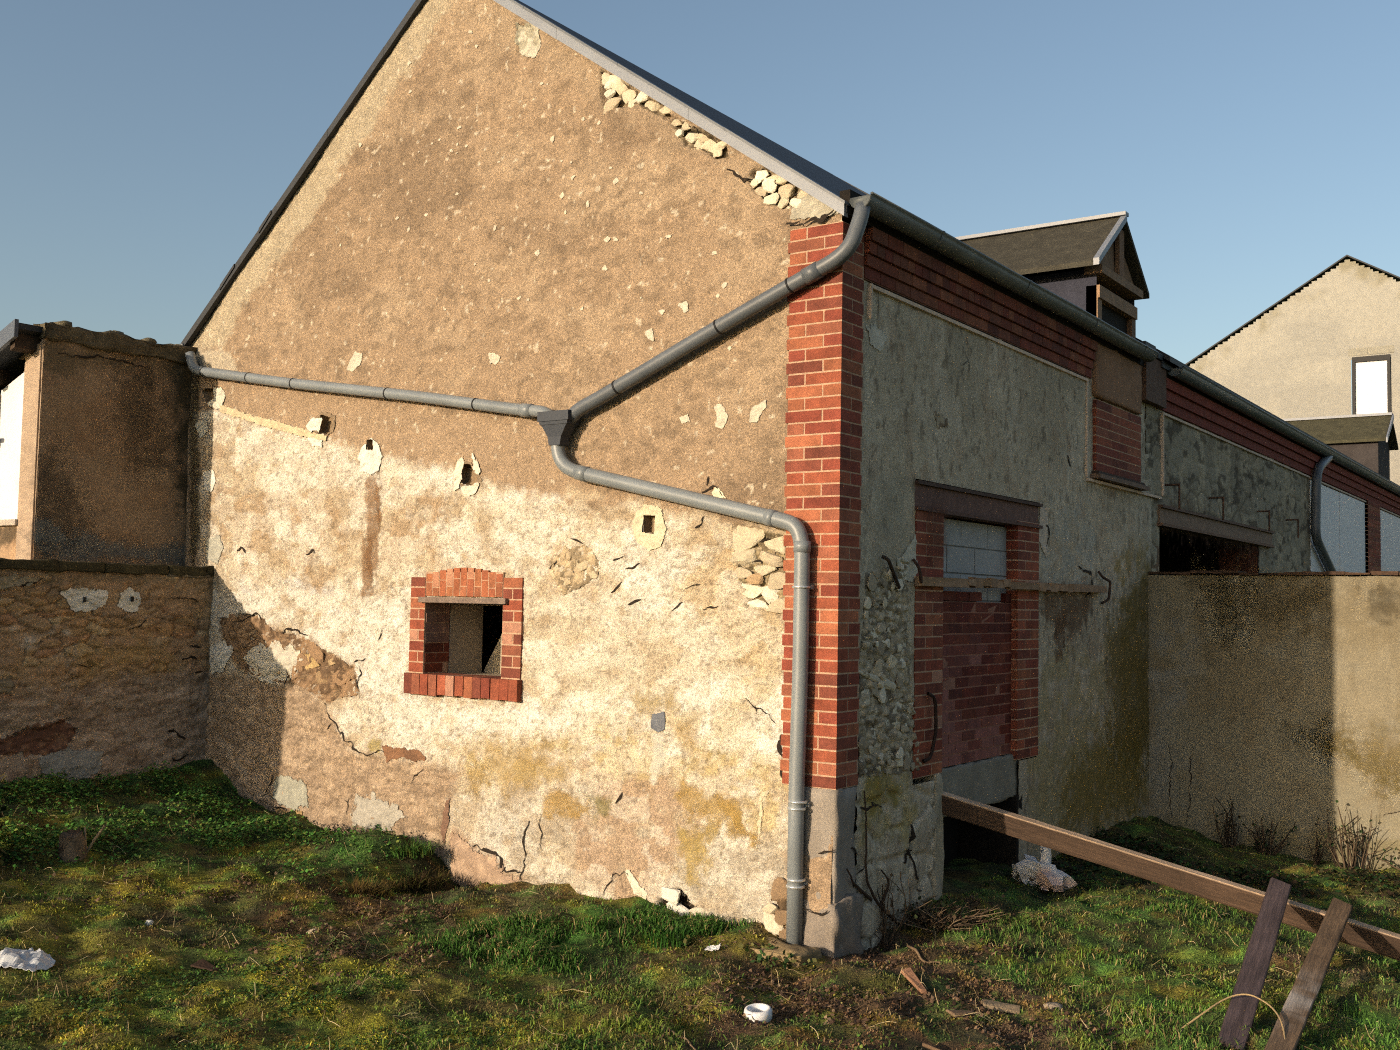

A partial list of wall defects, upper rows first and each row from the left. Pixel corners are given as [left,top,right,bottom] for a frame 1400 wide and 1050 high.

spalling [581,70,729,159]
spalling [750,168,808,209]
damp [33,373,200,564]
spalling [306,412,335,447]
spalling [453,453,482,496]
spalling [730,525,786,614]
spalling [209,614,359,702]
crack [324,703,383,756]
damp [1060,578,1149,827]
crack [473,816,542,880]
damp [544,792,608,817]
damp [677,782,754,880]